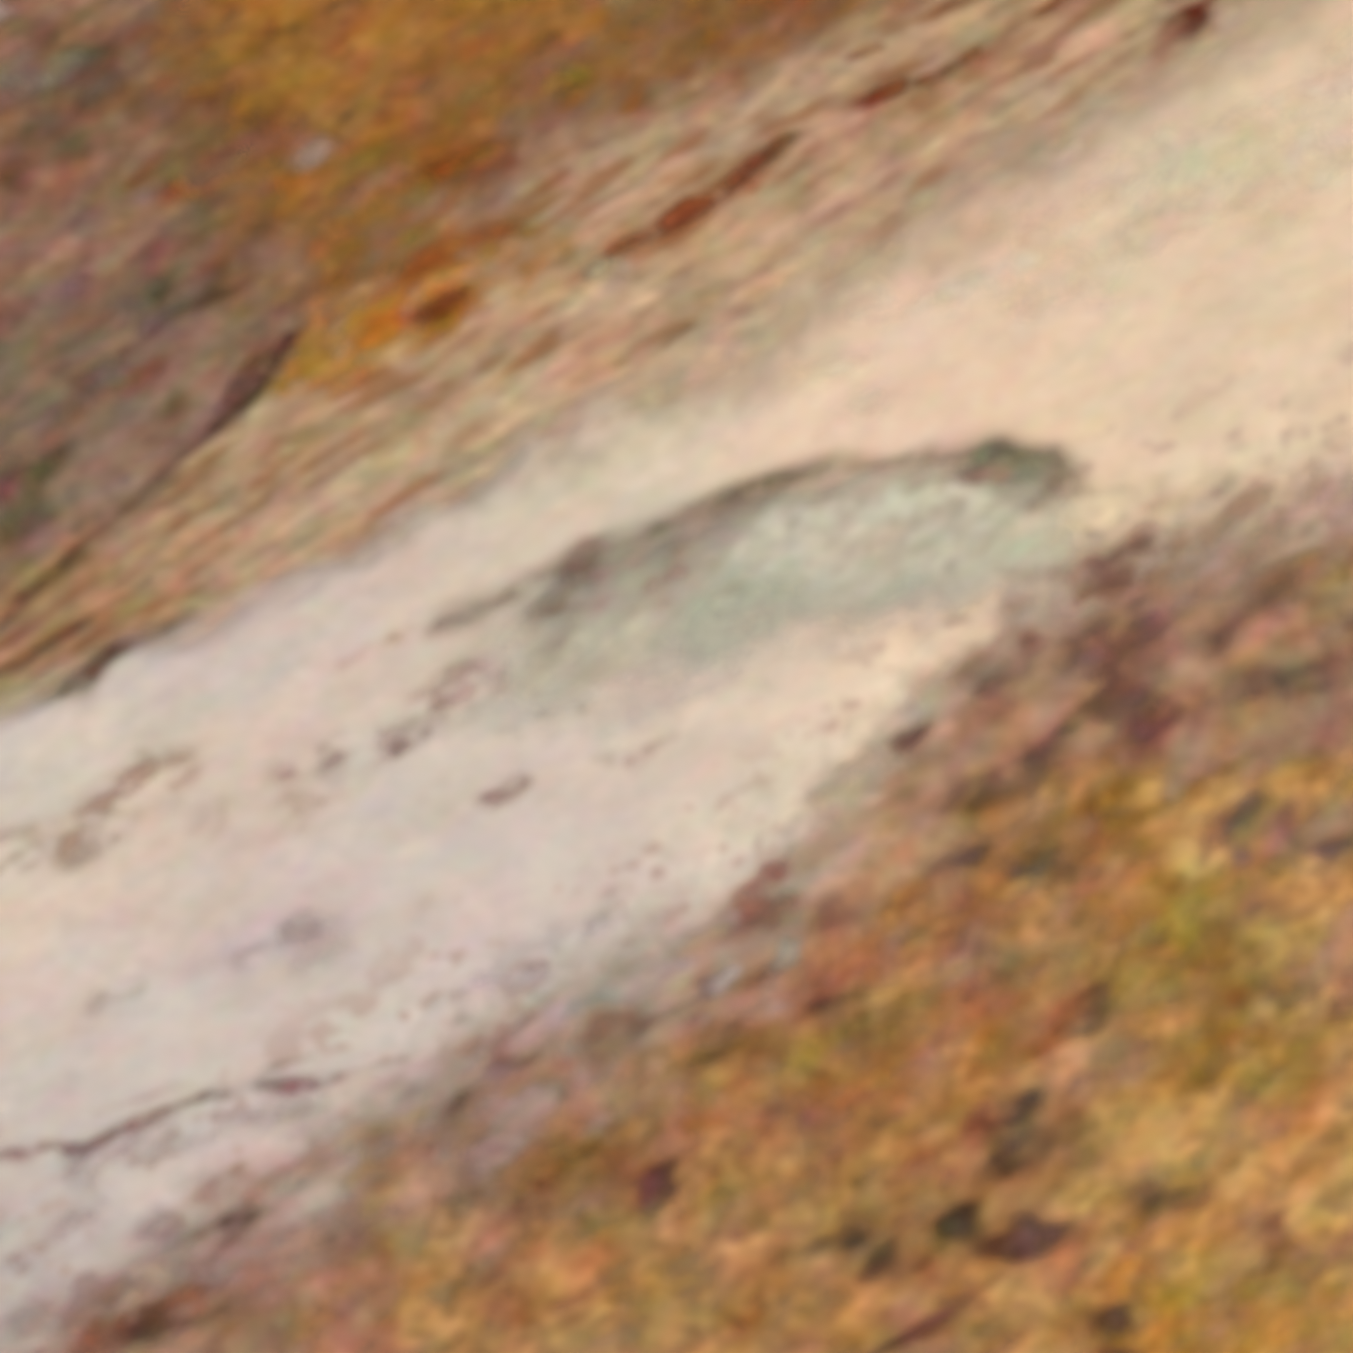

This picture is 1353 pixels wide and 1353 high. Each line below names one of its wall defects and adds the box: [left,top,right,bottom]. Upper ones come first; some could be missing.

leakage [1290,63,1353,99]
leakage [1093,101,1353,253]
leakage [941,227,1055,300]
leakage [1093,260,1118,278]
leakage [903,291,934,314]
leakage [810,355,856,377]
leakage [1124,528,1163,550]
leakage [121,760,157,783]
leakage [82,791,119,812]
leakage [484,791,511,802]
leakage [278,1102,314,1118]
leakage [468,1086,558,1174]